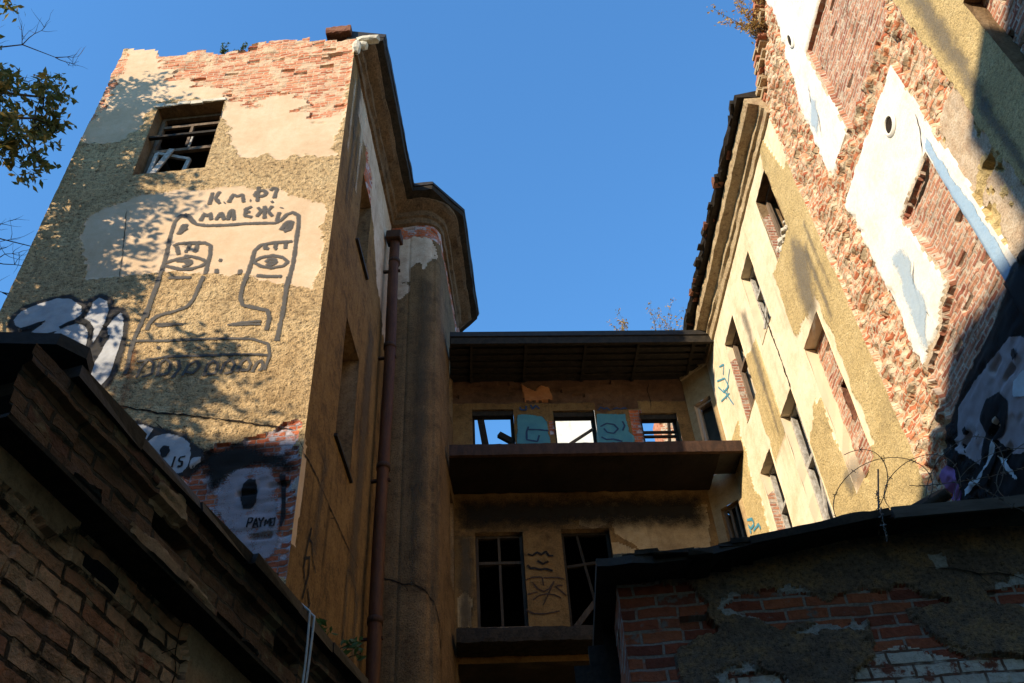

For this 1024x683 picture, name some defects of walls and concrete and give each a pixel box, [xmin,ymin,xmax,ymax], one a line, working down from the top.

peeling [80,37,460,343]
flaking render [707,0,1011,532]
crack [122,406,358,567]
flaking render [182,419,307,579]
crack [384,578,442,667]
peeling [727,667,789,683]
peeling [854,608,1024,683]